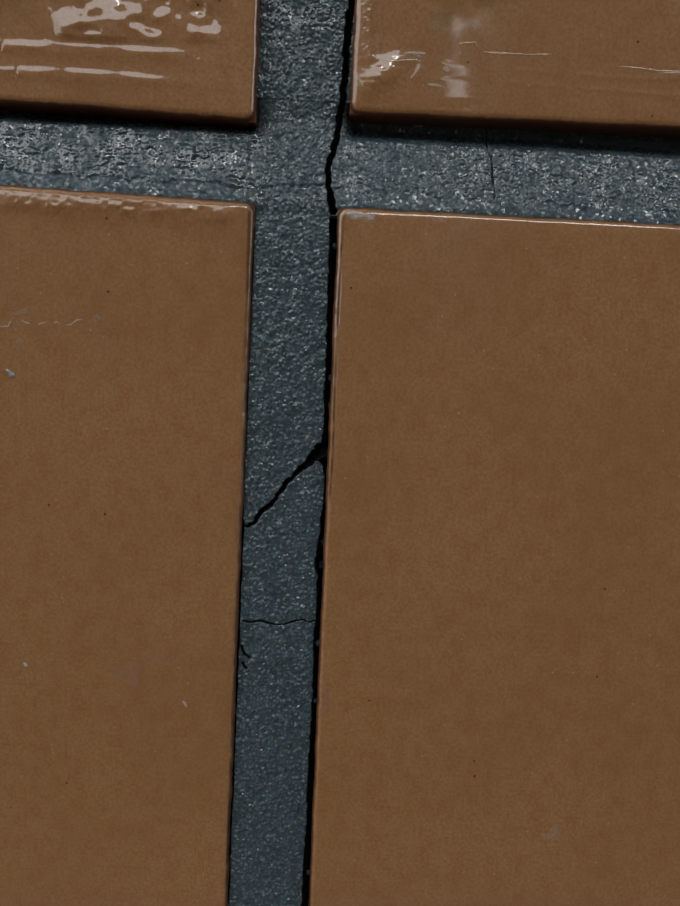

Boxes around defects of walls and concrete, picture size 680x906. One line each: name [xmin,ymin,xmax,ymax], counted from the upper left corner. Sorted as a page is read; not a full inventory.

crack [228,0,355,906]